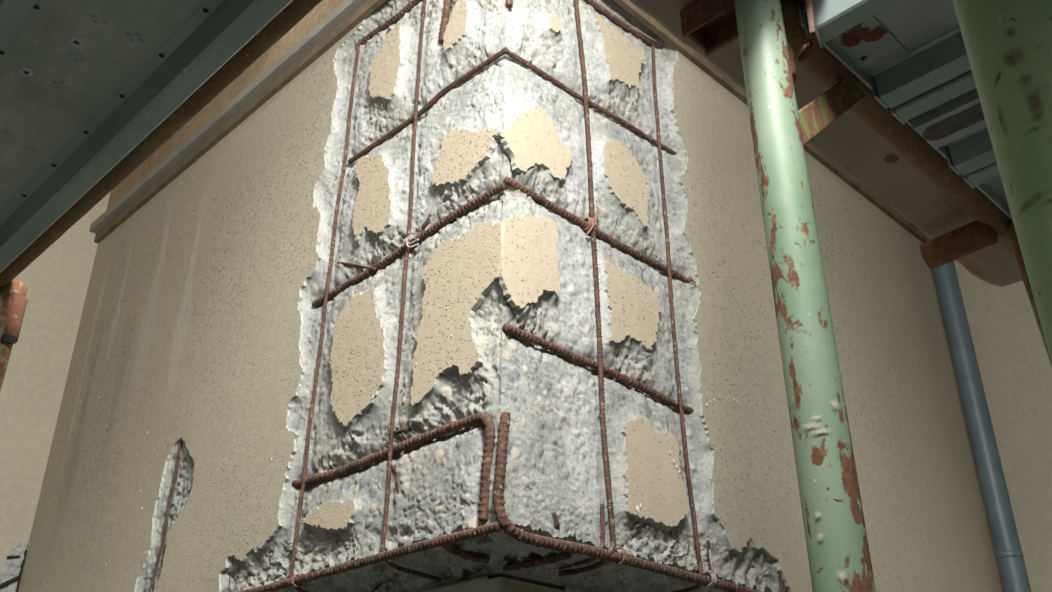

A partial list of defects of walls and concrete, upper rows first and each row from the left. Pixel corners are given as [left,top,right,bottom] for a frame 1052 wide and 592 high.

rust [838,22,889,48]
spalling [221,0,788,592]
spalling [0,538,29,592]
spalling [137,439,195,592]